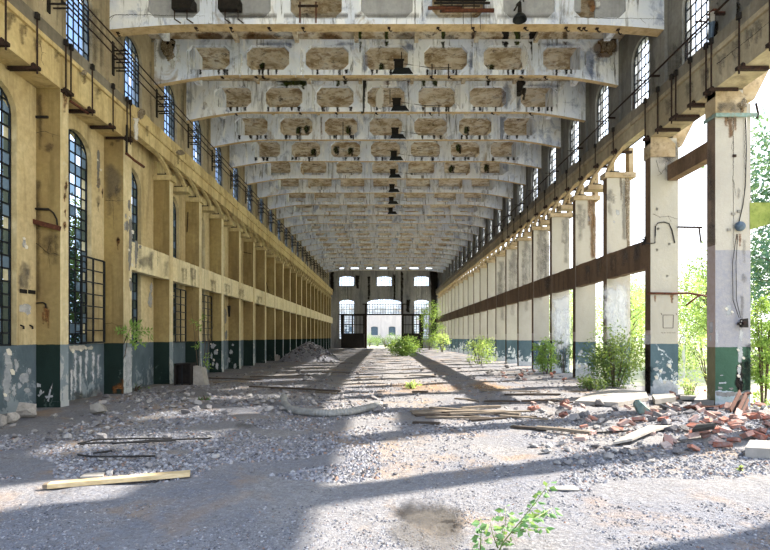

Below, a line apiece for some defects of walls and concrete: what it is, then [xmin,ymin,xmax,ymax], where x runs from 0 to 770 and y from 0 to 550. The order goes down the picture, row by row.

spalling [151,39,179,68]
spalling [594,39,617,70]
peeling [69,345,93,353]
peeling [3,348,53,402]
peeling [609,329,770,451]